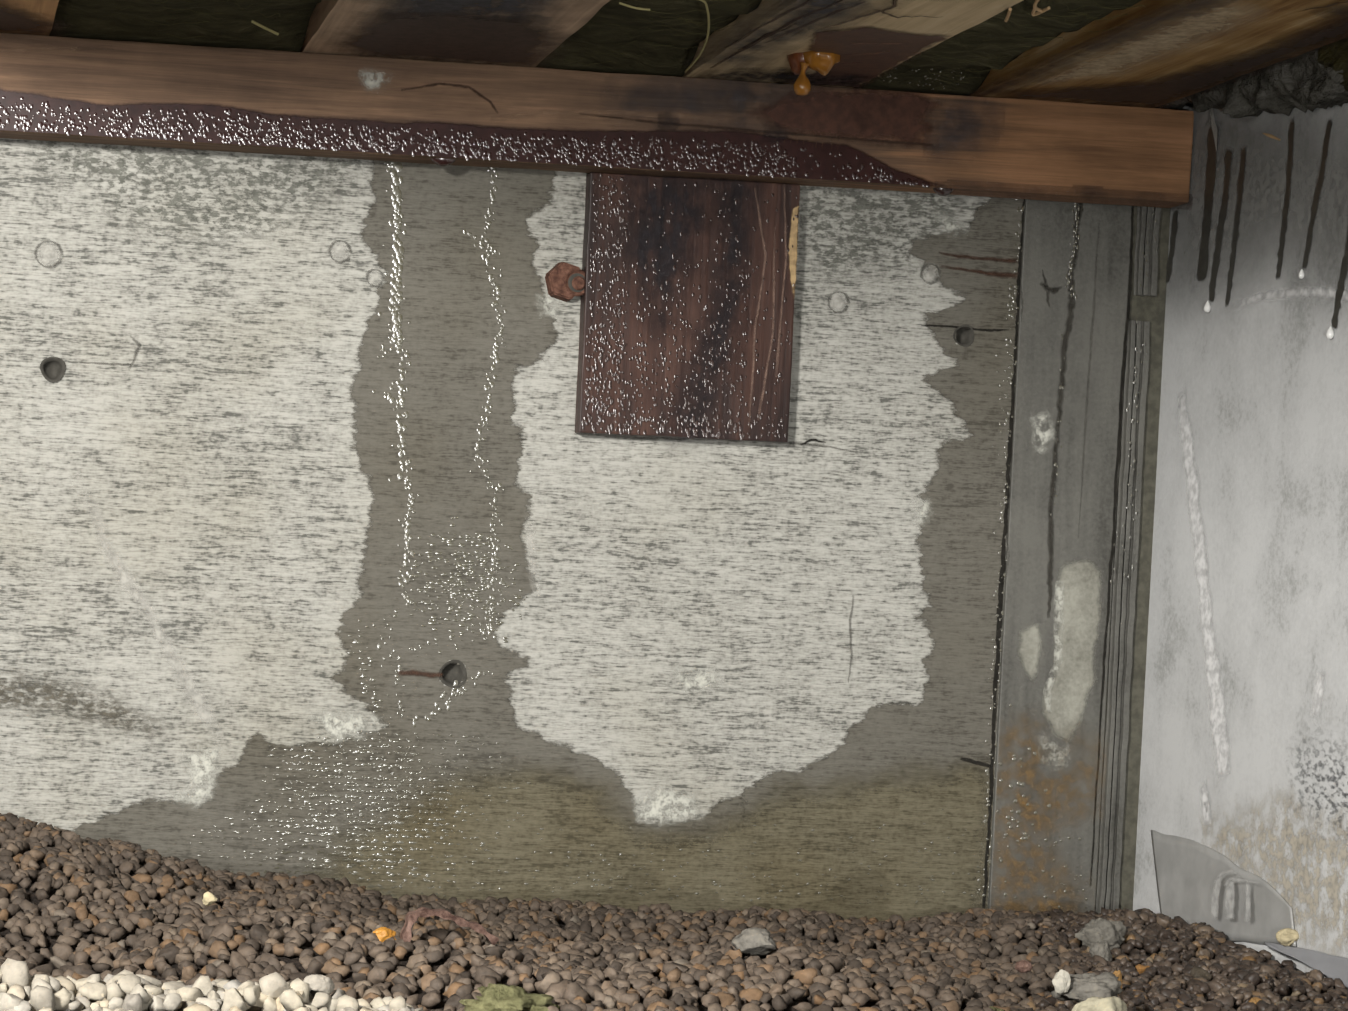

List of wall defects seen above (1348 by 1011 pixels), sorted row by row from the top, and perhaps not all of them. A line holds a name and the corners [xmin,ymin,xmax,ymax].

damp [0,0,1025,921]
corrosion [994,743,1087,911]
damp [1110,128,1348,910]